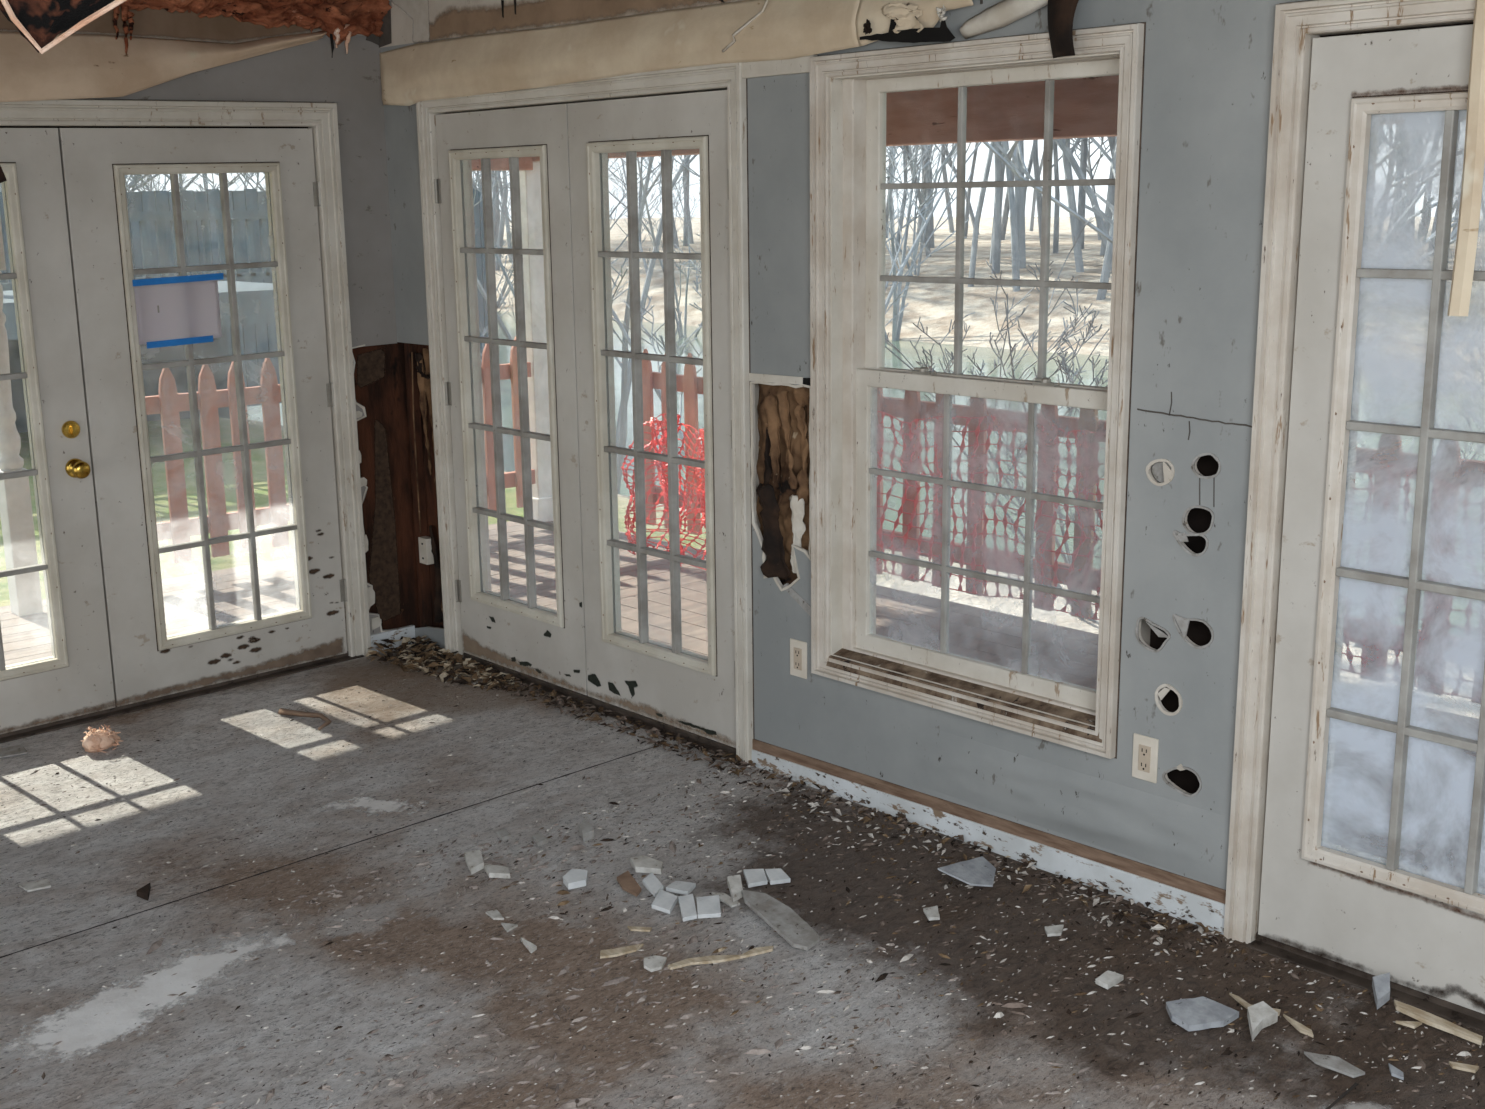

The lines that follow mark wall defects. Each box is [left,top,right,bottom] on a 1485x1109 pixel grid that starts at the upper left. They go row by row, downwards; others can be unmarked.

flaking render [380,0,745,48]
spalling [352,342,444,632]
spalling [749,373,811,617]